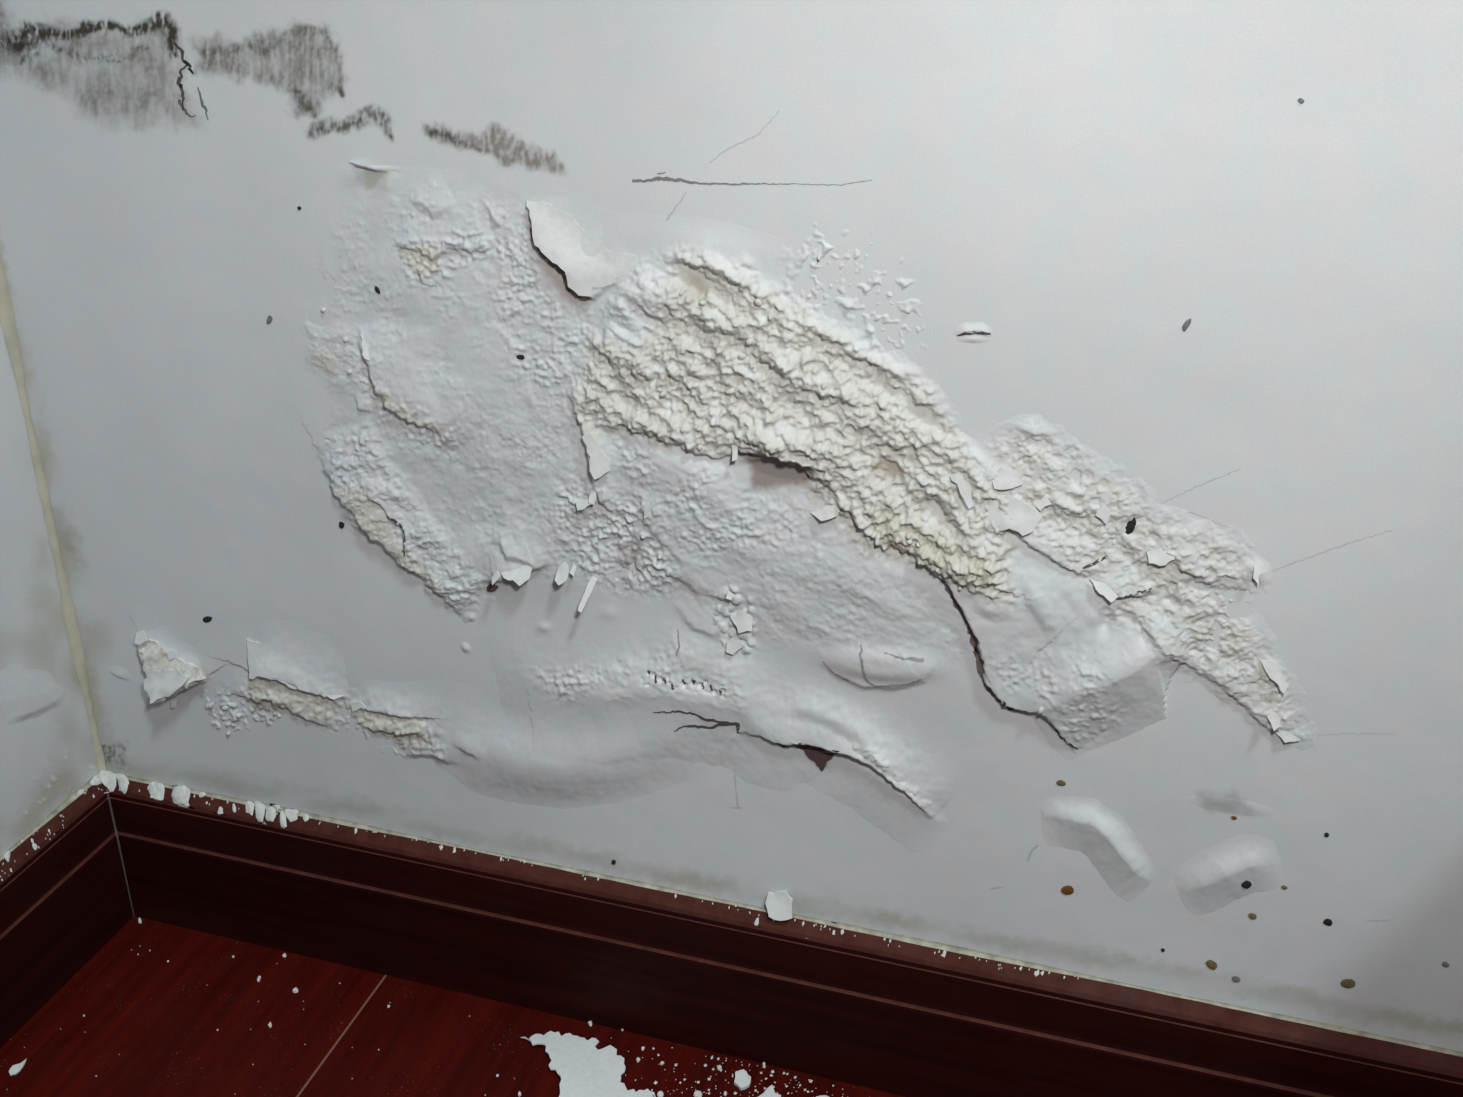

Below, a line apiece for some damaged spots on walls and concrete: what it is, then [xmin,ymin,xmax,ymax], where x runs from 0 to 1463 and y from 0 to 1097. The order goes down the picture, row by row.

leakage [0,12,177,74]
leakage [203,45,239,72]
leakage [256,27,392,139]
leakage [430,127,562,170]
peeling [302,161,411,213]
spalling [508,175,1319,751]
peeling [108,606,448,769]
crack [653,710,740,733]